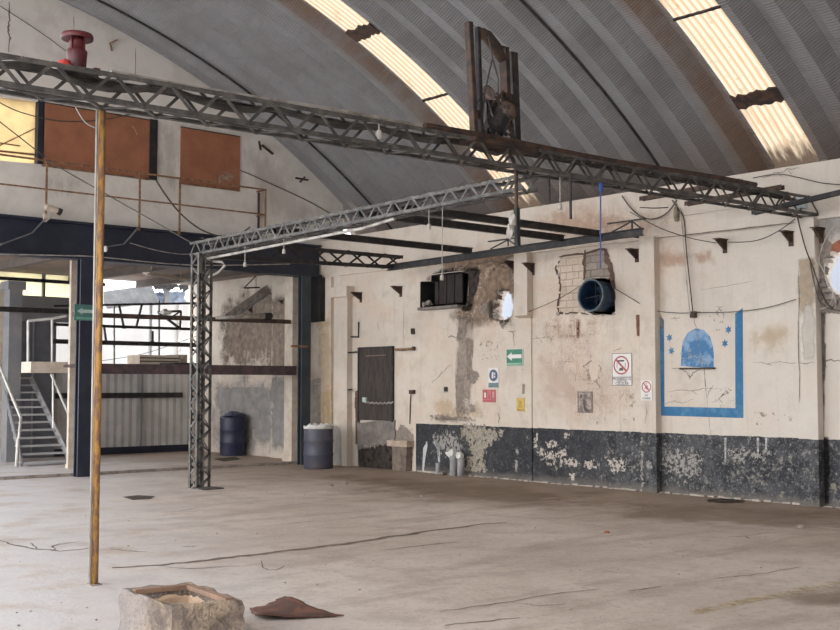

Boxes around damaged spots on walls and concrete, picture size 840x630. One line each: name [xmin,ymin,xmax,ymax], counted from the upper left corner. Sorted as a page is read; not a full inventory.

water stain [220,293,285,366]
water stain [443,254,514,416]
flaking render [478,288,513,329]
flaking render [555,248,616,316]
peeling [803,236,840,358]
water stain [216,375,284,448]
peeling [430,404,503,475]
peeling [534,433,626,480]
peeling [662,443,711,486]
peeling [727,446,770,464]
crack [0,540,88,551]
crack [112,523,493,570]